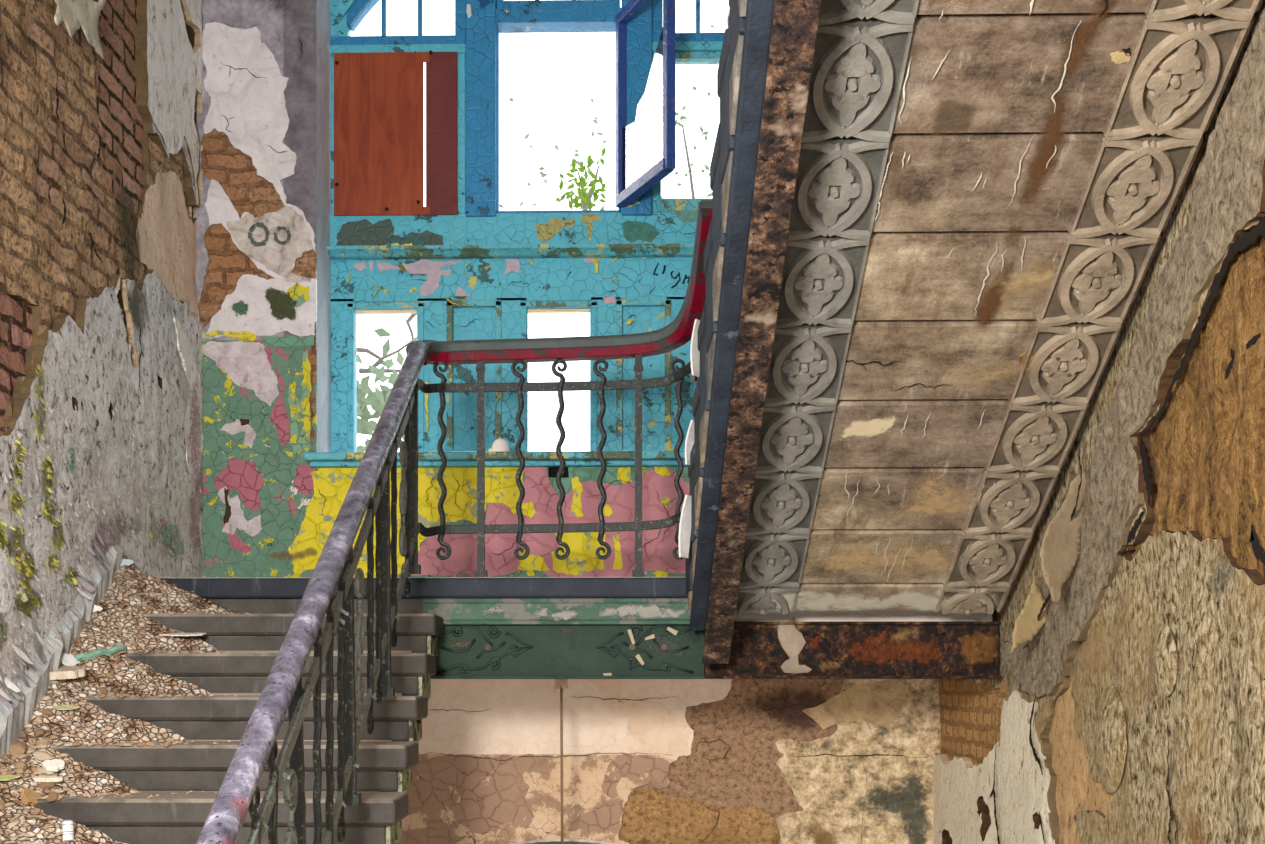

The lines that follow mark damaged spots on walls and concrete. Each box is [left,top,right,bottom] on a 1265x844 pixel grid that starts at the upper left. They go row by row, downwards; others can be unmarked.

peeling [337,219,477,308]
peeling [536,213,600,242]
peeling [622,221,660,242]
spalling [0,0,358,711]
peeling [353,455,690,579]
spalling [932,159,1265,844]
spalling [567,673,844,844]
leakage [756,691,826,729]
leakage [809,825,836,844]
mould [868,775,930,844]
crack [990,750,1000,844]
crack [1029,695,1043,775]